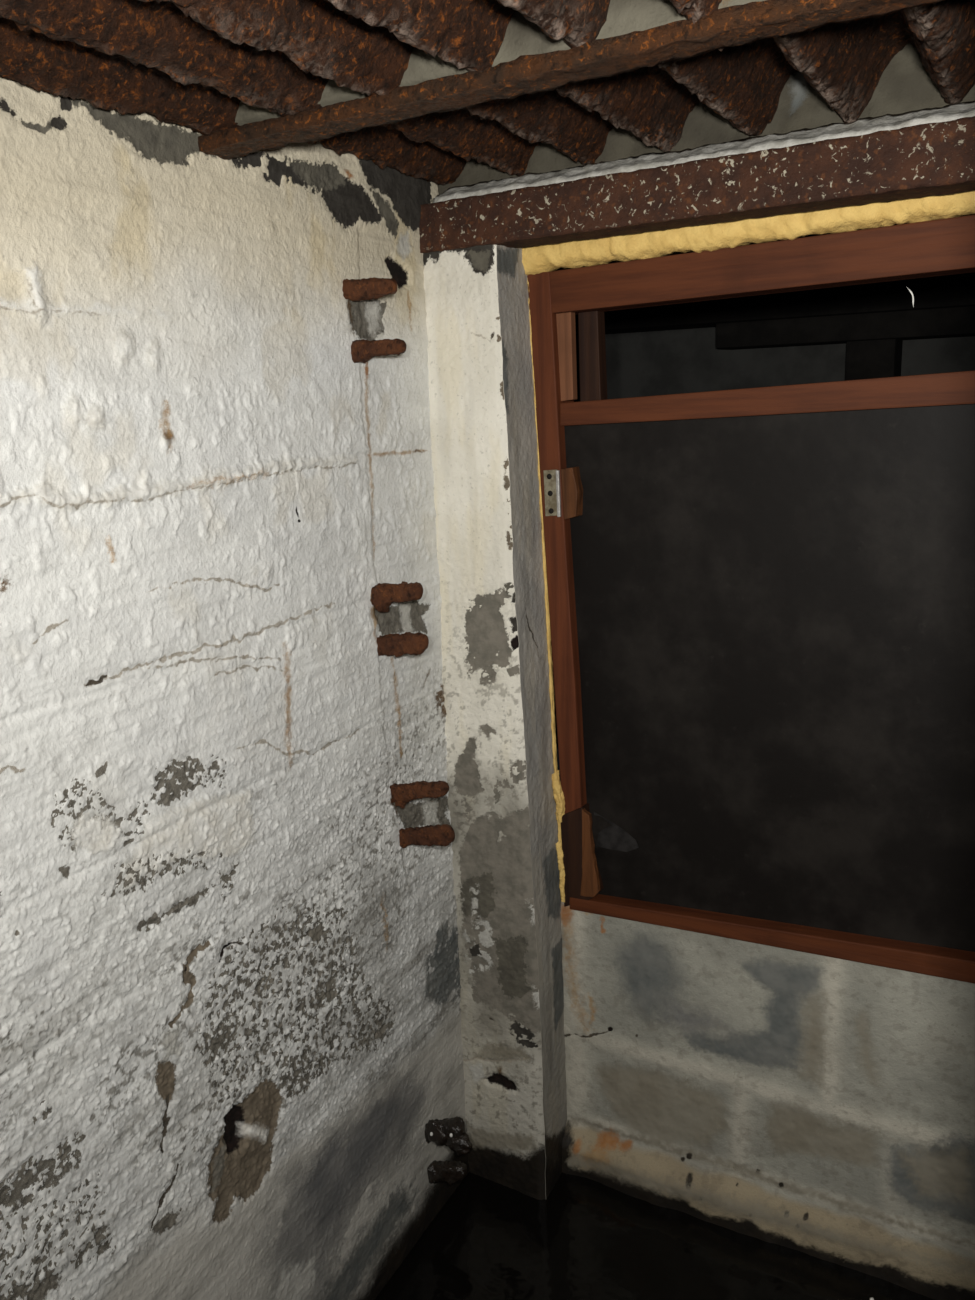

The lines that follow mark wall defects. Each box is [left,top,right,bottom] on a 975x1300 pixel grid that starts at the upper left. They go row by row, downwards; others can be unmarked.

rust [371,594,390,643]
peeling [464,582,520,686]
peeling [390,724,541,1048]
damp [542,849,561,921]
peeling [193,902,396,1223]
spalling [468,1059,517,1091]
damp [251,919,975,1300]